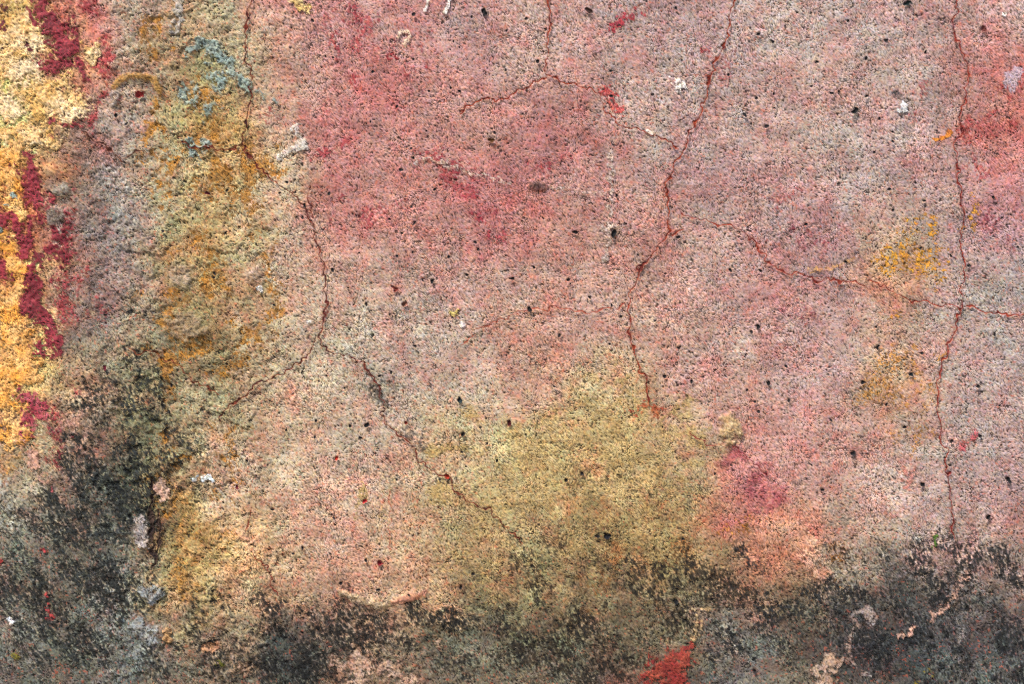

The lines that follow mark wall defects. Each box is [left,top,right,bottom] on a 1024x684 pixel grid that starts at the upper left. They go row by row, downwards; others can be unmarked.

crack [129,0,546,595]
damp [0,335,1024,684]
crack [460,0,1024,539]